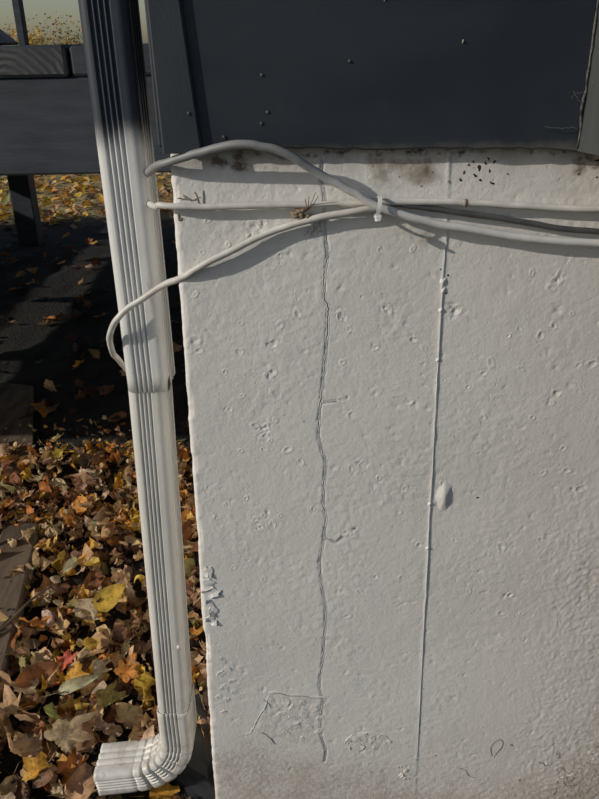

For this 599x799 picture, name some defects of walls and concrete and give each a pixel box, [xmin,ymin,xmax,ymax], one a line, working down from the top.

spalling [201,566,221,626]
crack [316,163,355,762]